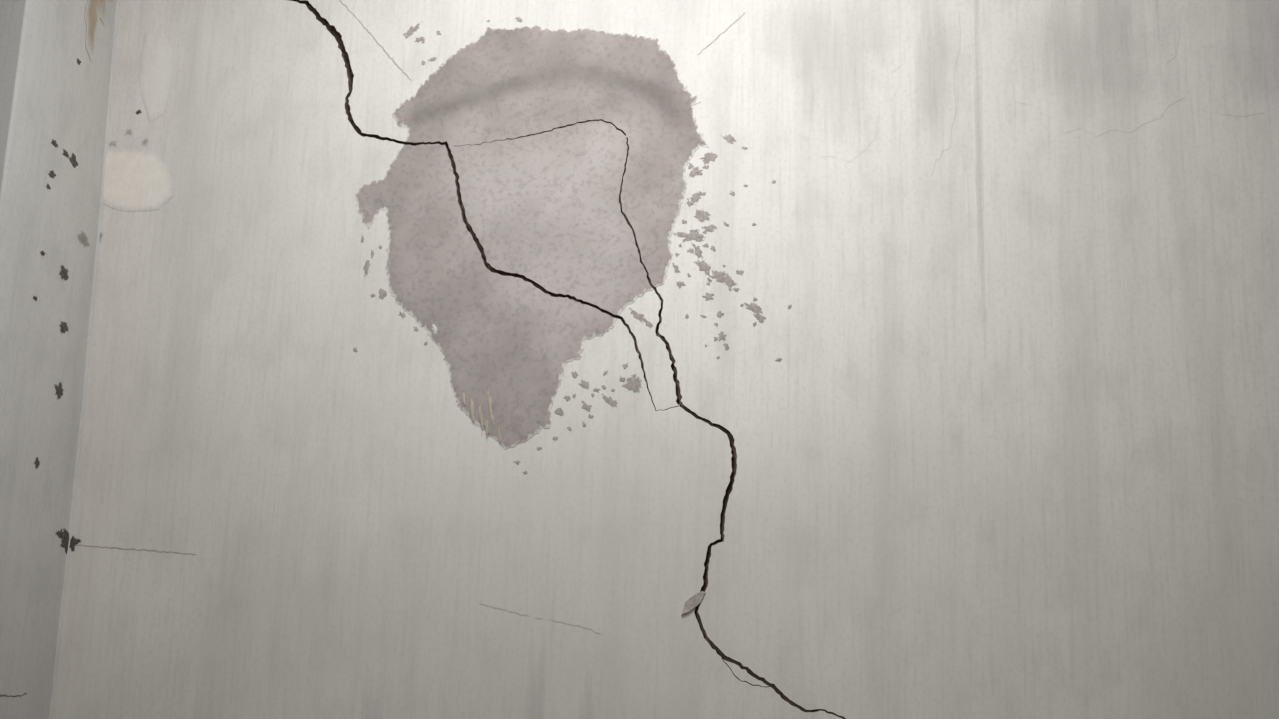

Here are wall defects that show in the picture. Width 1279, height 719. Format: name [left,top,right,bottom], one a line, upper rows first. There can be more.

crack [289,0,846,719]